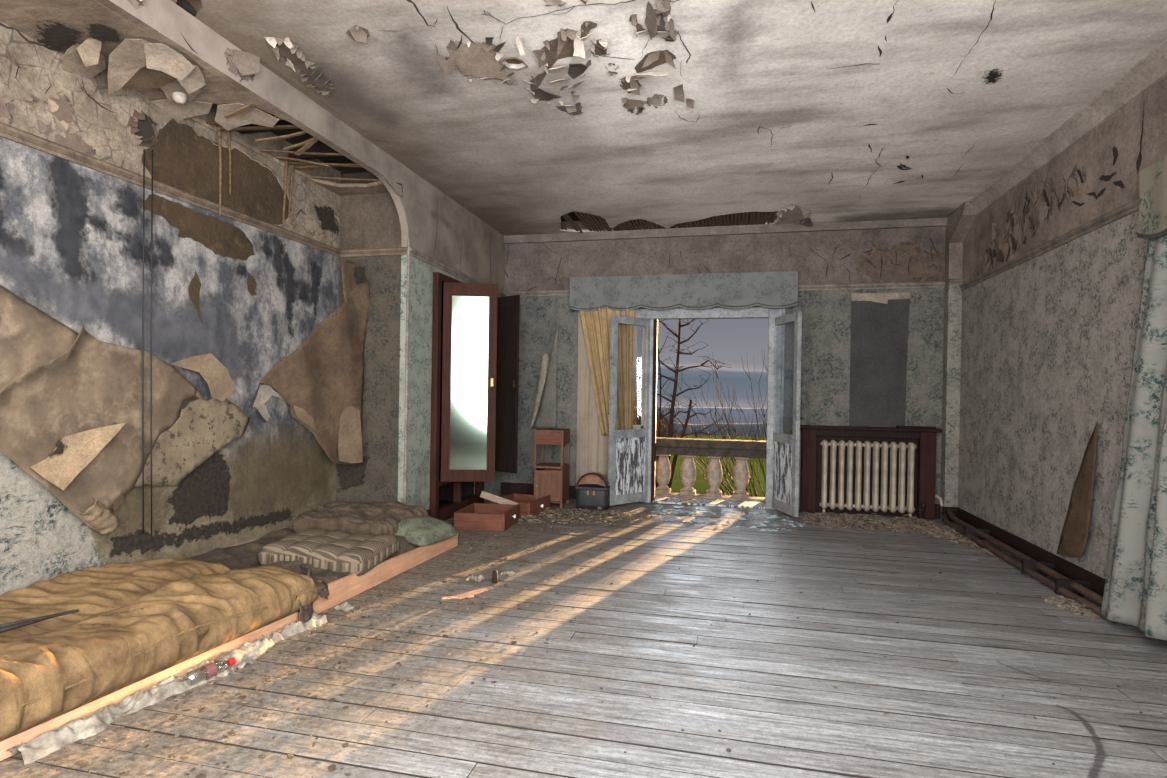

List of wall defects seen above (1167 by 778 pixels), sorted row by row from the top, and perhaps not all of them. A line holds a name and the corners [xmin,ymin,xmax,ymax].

water stain [33,21,120,51]
peeling [265,35,336,95]
crack [407,0,635,85]
peeling [435,0,699,122]
crack [947,0,996,94]
peeling [0,93,96,156]
spalling [61,34,293,296]
water stain [313,203,339,234]
water stain [0,156,244,378]
spalling [188,271,203,324]
water stain [237,263,248,277]
water stain [260,235,322,337]